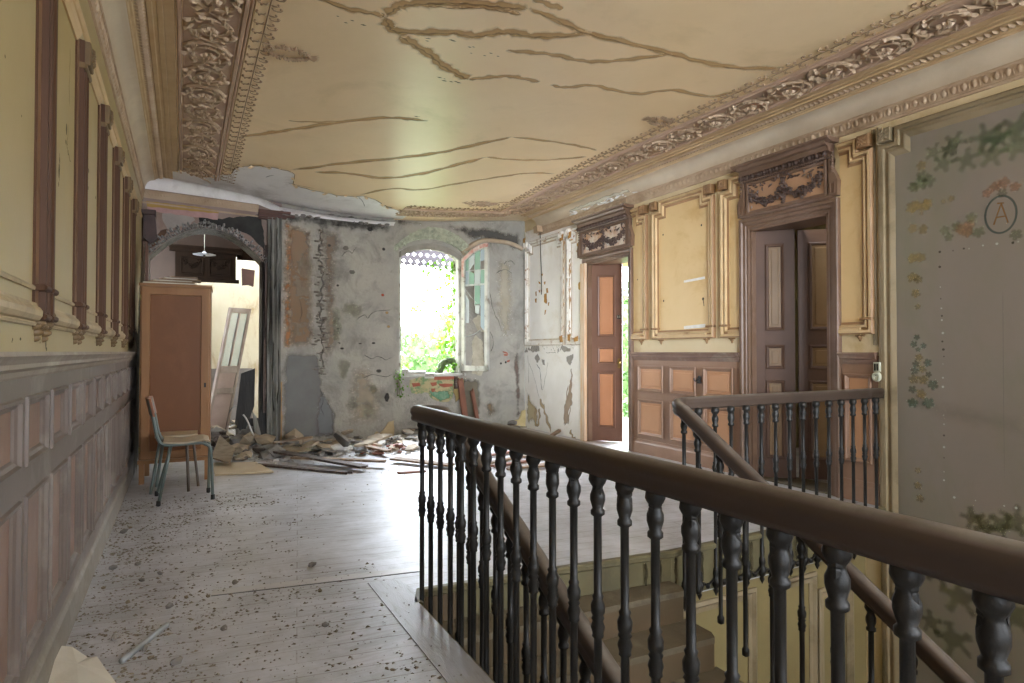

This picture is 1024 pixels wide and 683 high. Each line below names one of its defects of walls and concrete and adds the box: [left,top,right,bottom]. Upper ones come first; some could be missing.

peeling [172,165,406,375]
peeling [559,230,589,342]